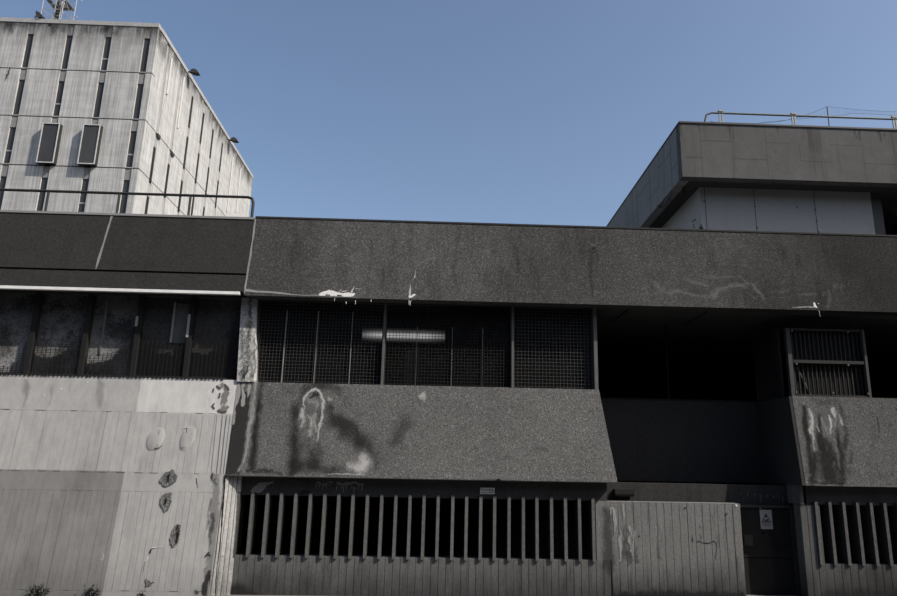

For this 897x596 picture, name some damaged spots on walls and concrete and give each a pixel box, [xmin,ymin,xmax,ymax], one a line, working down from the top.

peeling [211,298,258,425]
water stain [803,406,847,485]
spalling [160,469,178,512]
spalling [170,524,181,547]